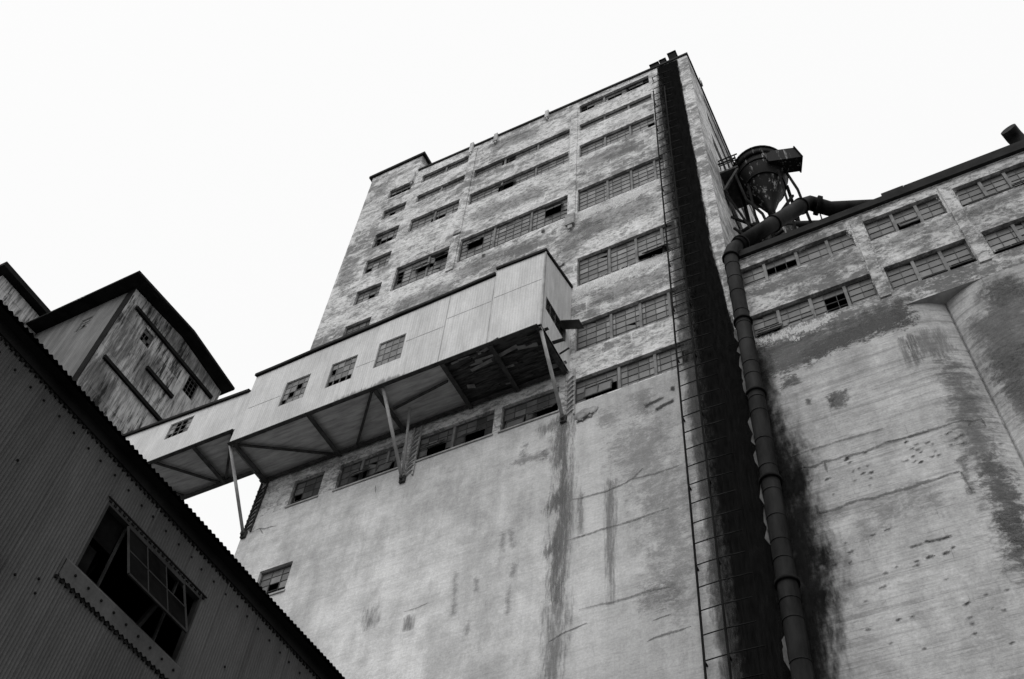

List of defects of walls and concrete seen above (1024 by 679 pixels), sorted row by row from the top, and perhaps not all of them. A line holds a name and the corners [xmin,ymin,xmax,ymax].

leakage [758,313,836,342]
crack [790,418,985,470]
leakage [905,276,1024,571]
crack [577,465,678,499]
crack [820,471,969,514]
leakage [543,418,582,679]
leakage [606,483,614,575]
crack [566,509,665,541]